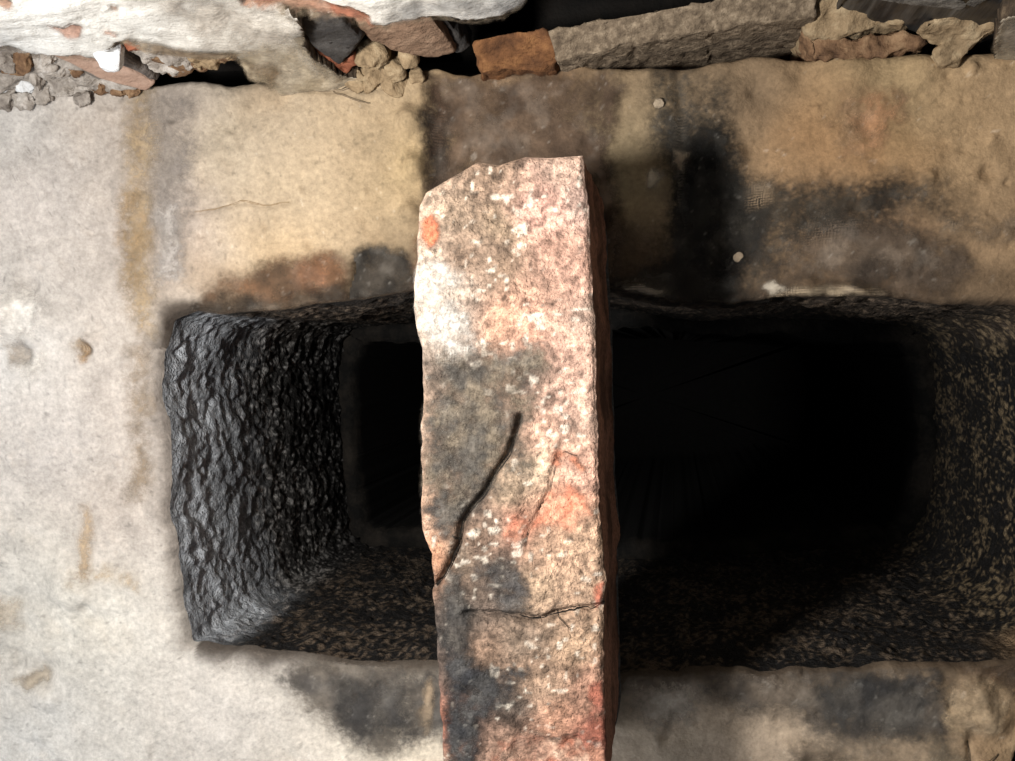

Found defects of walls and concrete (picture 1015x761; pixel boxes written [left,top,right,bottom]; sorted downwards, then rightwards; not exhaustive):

peeling [52,25,82,39]
spalling [105,31,354,96]
peeling [240,0,370,26]
spalling [916,17,1010,69]
crack [436,415,523,585]
crack [525,451,577,544]
crack [471,601,605,629]